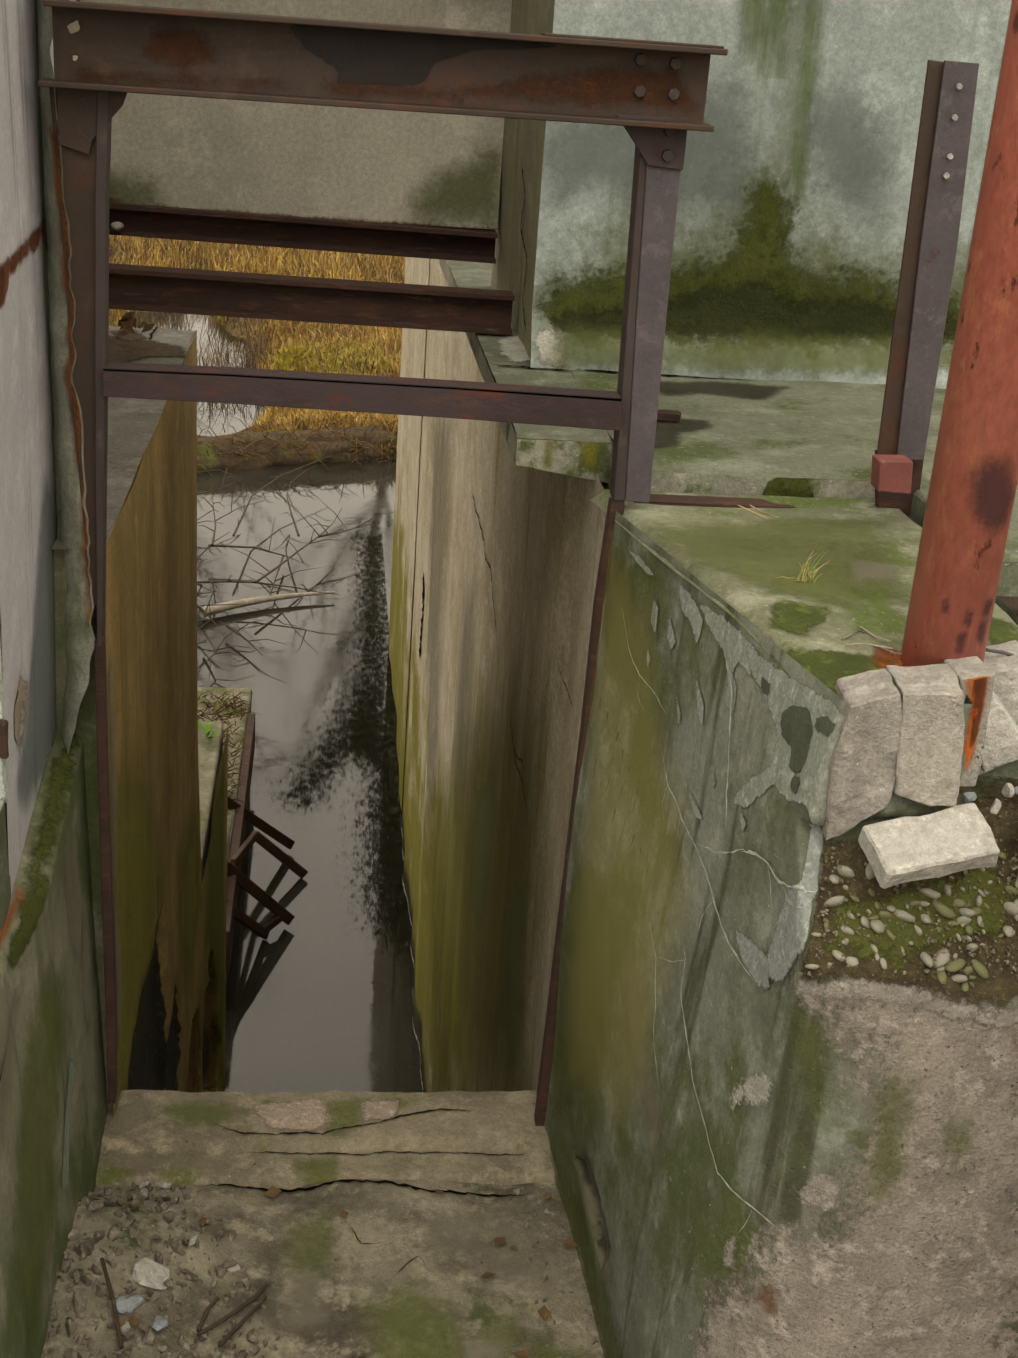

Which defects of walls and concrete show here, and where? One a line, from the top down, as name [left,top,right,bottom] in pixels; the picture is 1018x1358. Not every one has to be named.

corrosion [467,68,689,107]
damp [548,123,635,197]
damp [679,101,741,199]
corrosion [0,131,81,454]
damp [660,337,890,398]
corrosion [976,463,1012,527]
crack [622,611,666,713]
crack [725,653,733,815]
corrosion [964,676,987,769]
crack [650,755,817,1233]
efflorescence [729,1070,773,1110]
crack [207,1108,528,1197]